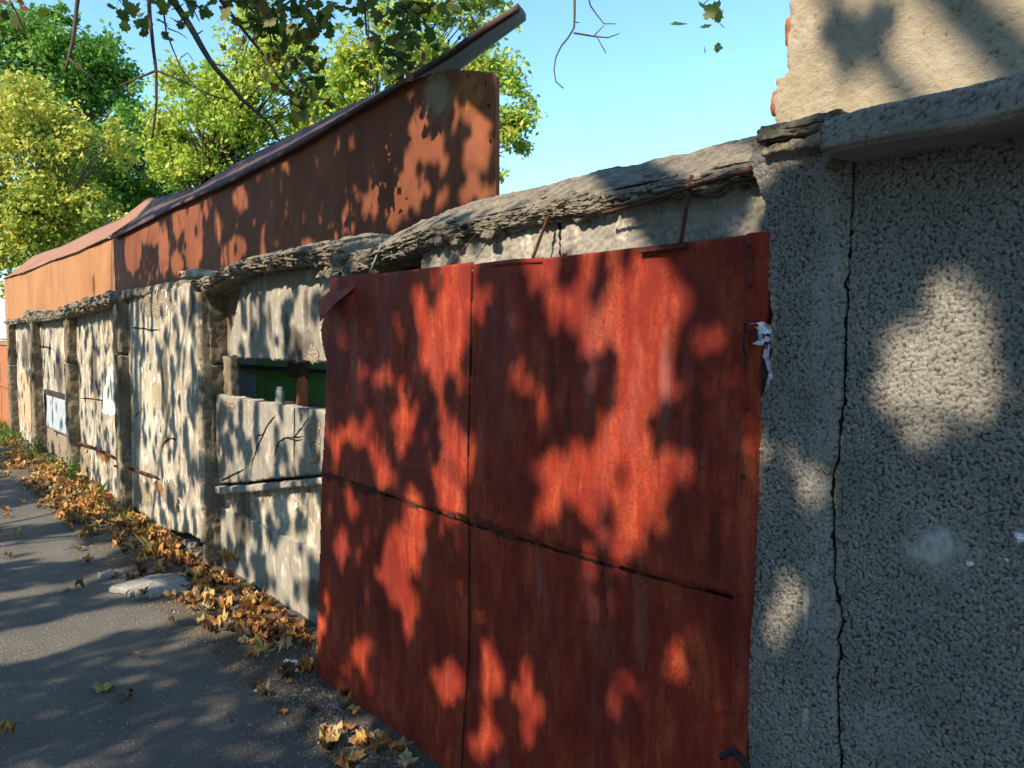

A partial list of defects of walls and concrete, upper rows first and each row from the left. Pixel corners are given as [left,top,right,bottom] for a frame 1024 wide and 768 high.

corrosion [602,167,753,215]
corrosion [76,442,163,495]
crack [221,399,310,481]
corrosion [320,472,418,510]
crack [814,163,856,768]
corrosion [432,507,518,541]